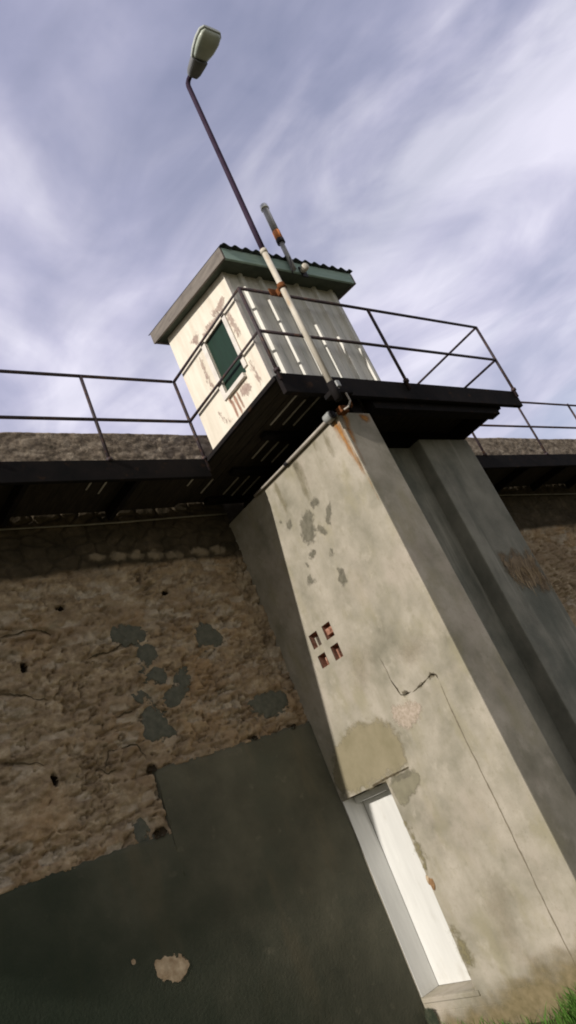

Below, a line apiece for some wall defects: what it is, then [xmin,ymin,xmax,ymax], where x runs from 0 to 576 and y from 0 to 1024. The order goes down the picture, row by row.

rust [333,415,369,465]
crack [383,665,574,962]
spalling [154,954,190,983]